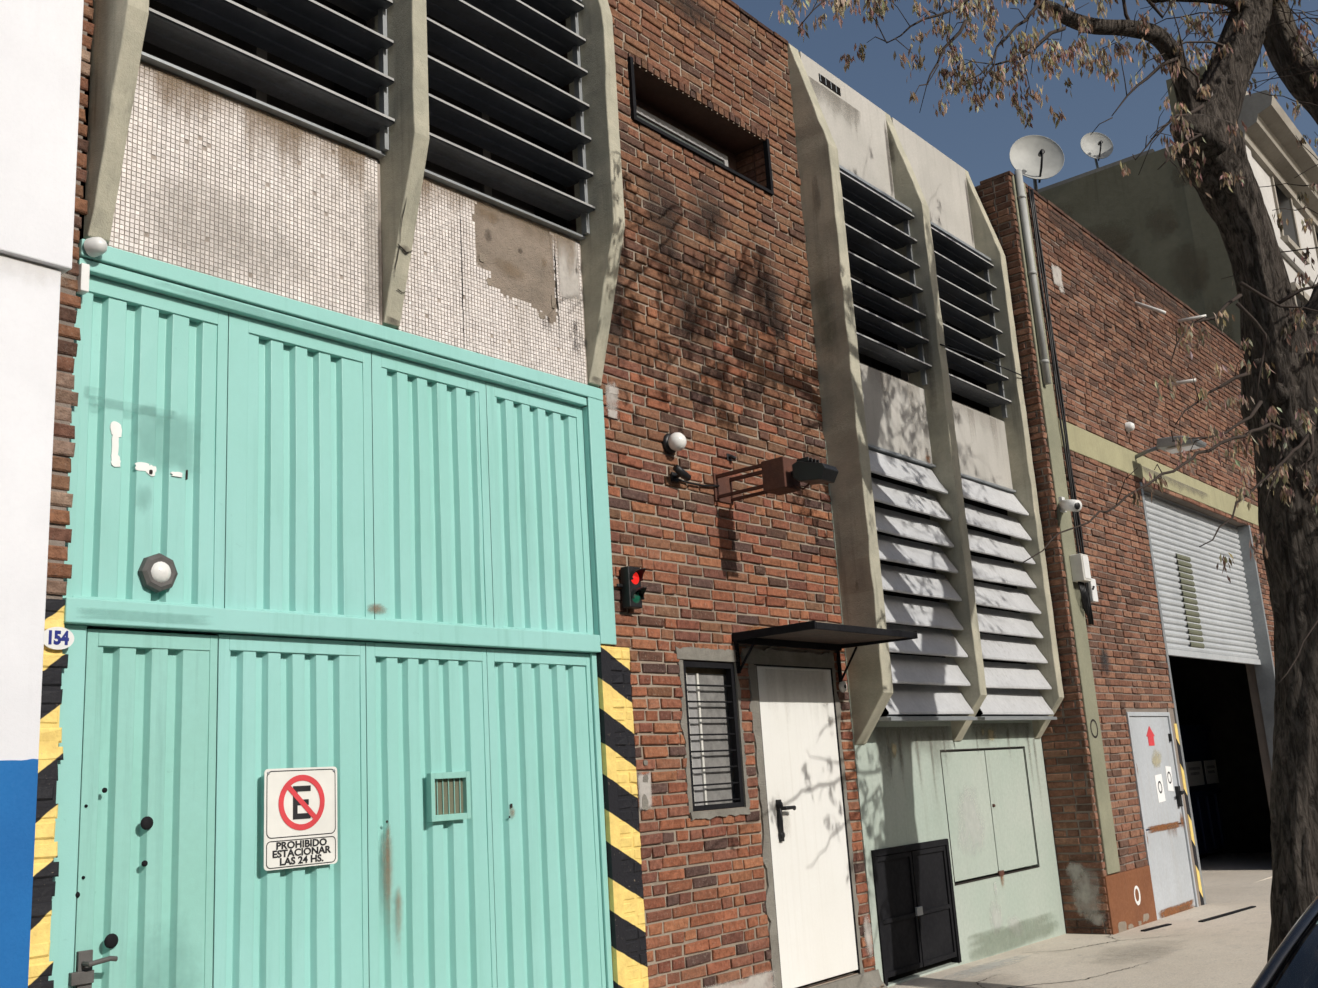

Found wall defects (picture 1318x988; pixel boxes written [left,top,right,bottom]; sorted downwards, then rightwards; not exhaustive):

spalling [472,199,579,323]
leakage [1067,864,1103,925]